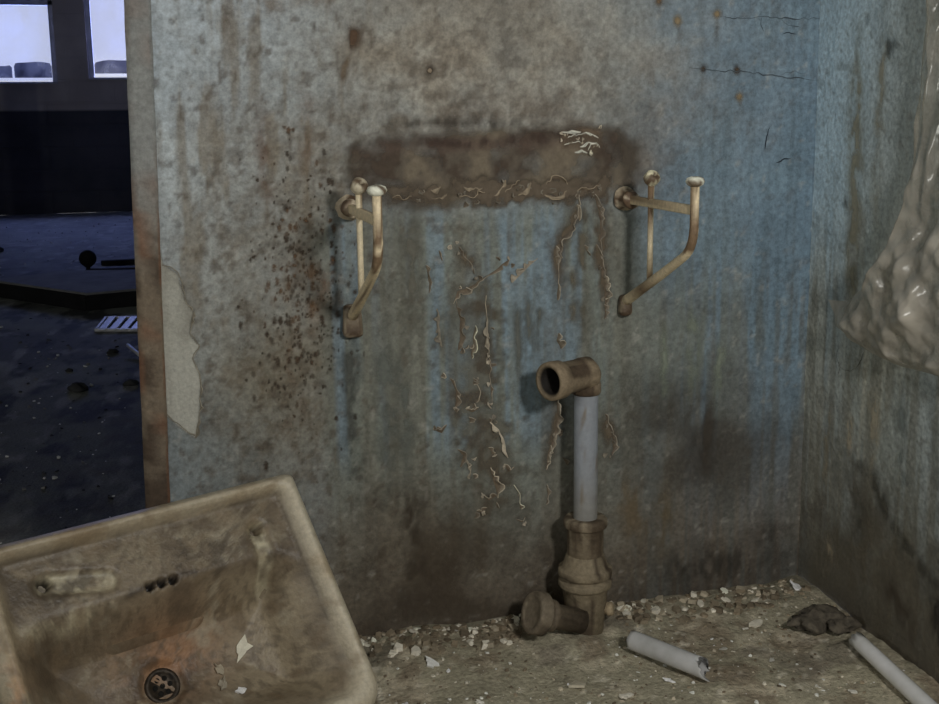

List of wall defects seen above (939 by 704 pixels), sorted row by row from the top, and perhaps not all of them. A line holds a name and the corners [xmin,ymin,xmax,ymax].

peeling [560,125,602,156]
water stain [845,82,861,244]
peeling [160,252,204,438]
rust [249,175,356,422]
peeling [433,241,538,526]
peeling [386,174,613,319]
peeling [546,400,570,470]